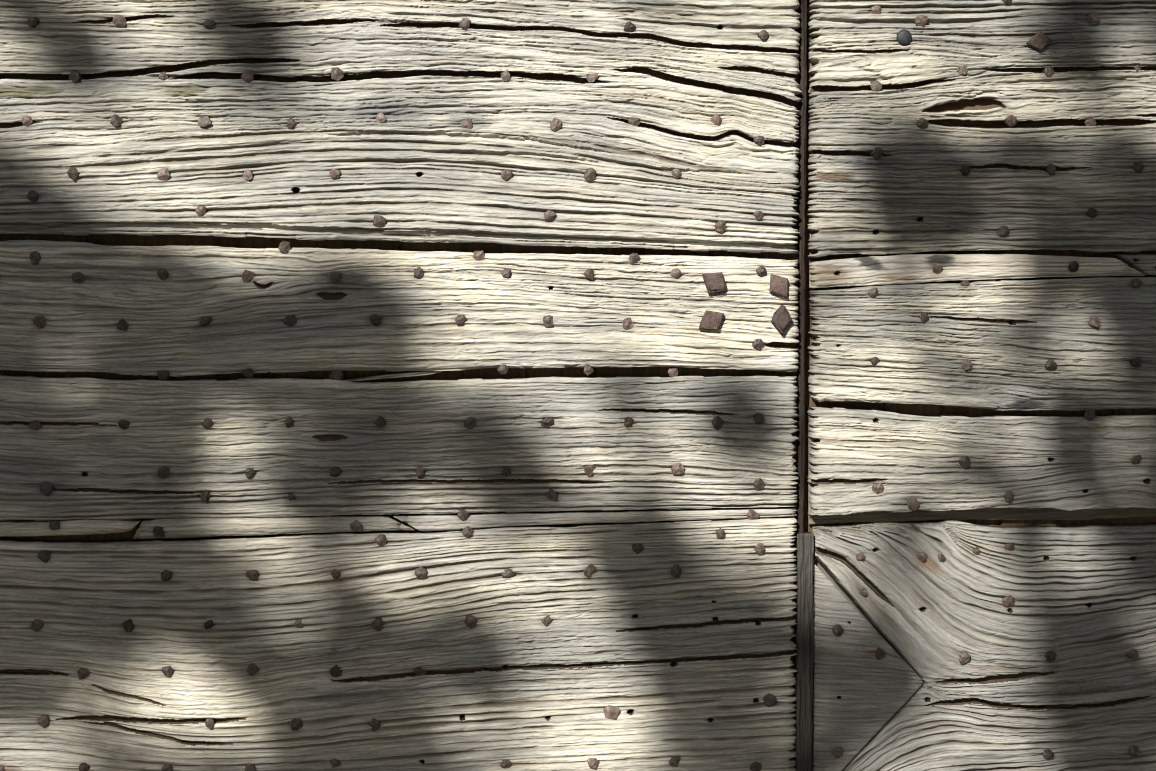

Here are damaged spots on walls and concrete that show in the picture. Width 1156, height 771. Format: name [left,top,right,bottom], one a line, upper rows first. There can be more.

crack [0,19,1156,128]
crack [607,117,891,157]
crack [0,669,246,746]